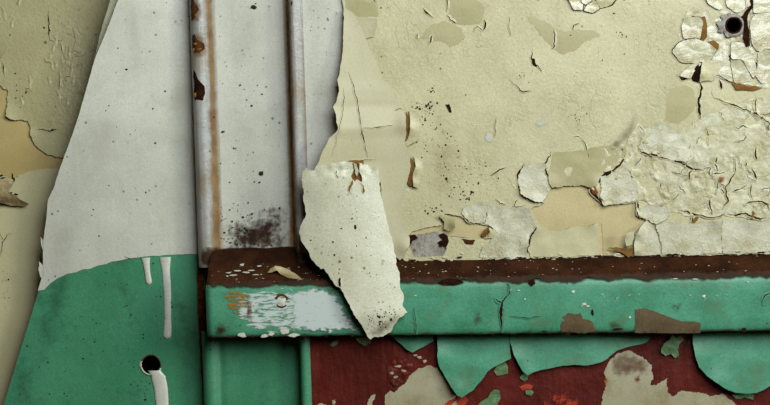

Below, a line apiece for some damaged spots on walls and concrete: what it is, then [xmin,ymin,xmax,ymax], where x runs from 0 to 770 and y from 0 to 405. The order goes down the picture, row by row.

crack [0,232,13,256]
peeling [0,0,110,405]
rust [194,0,220,250]
peeling [299,0,770,405]
crack [574,76,770,228]